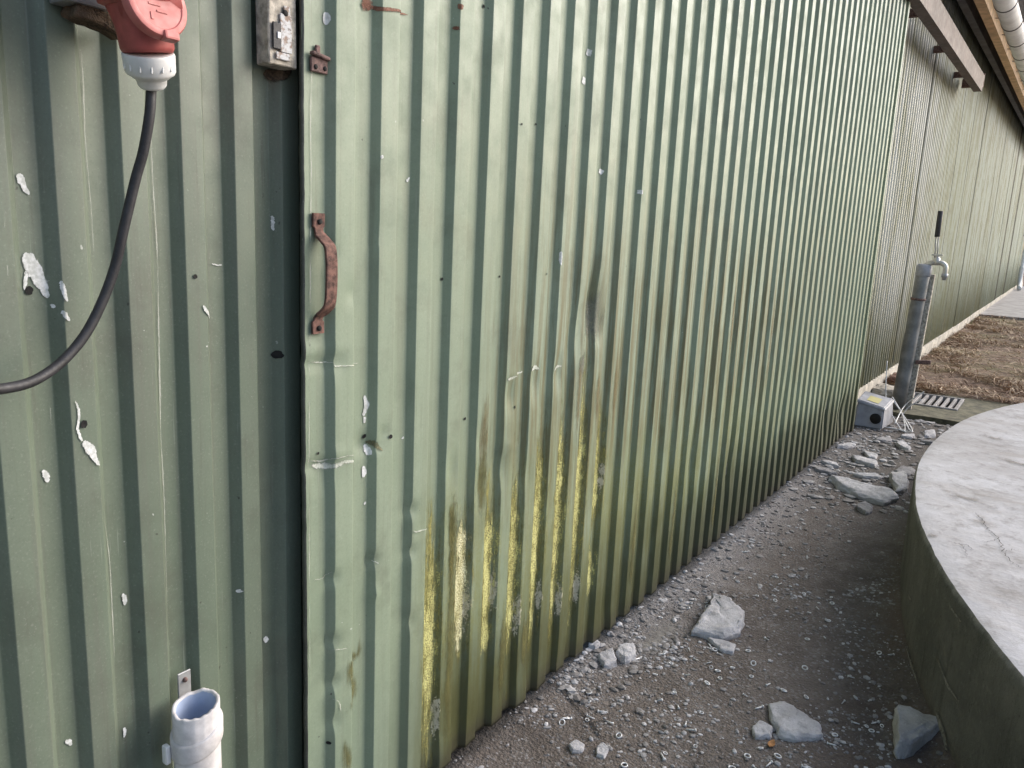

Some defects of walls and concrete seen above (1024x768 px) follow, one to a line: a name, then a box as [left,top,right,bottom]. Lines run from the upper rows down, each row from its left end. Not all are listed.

rust [362,0,407,15]
peeling [362,444,372,477]
damp [422,368,606,763]